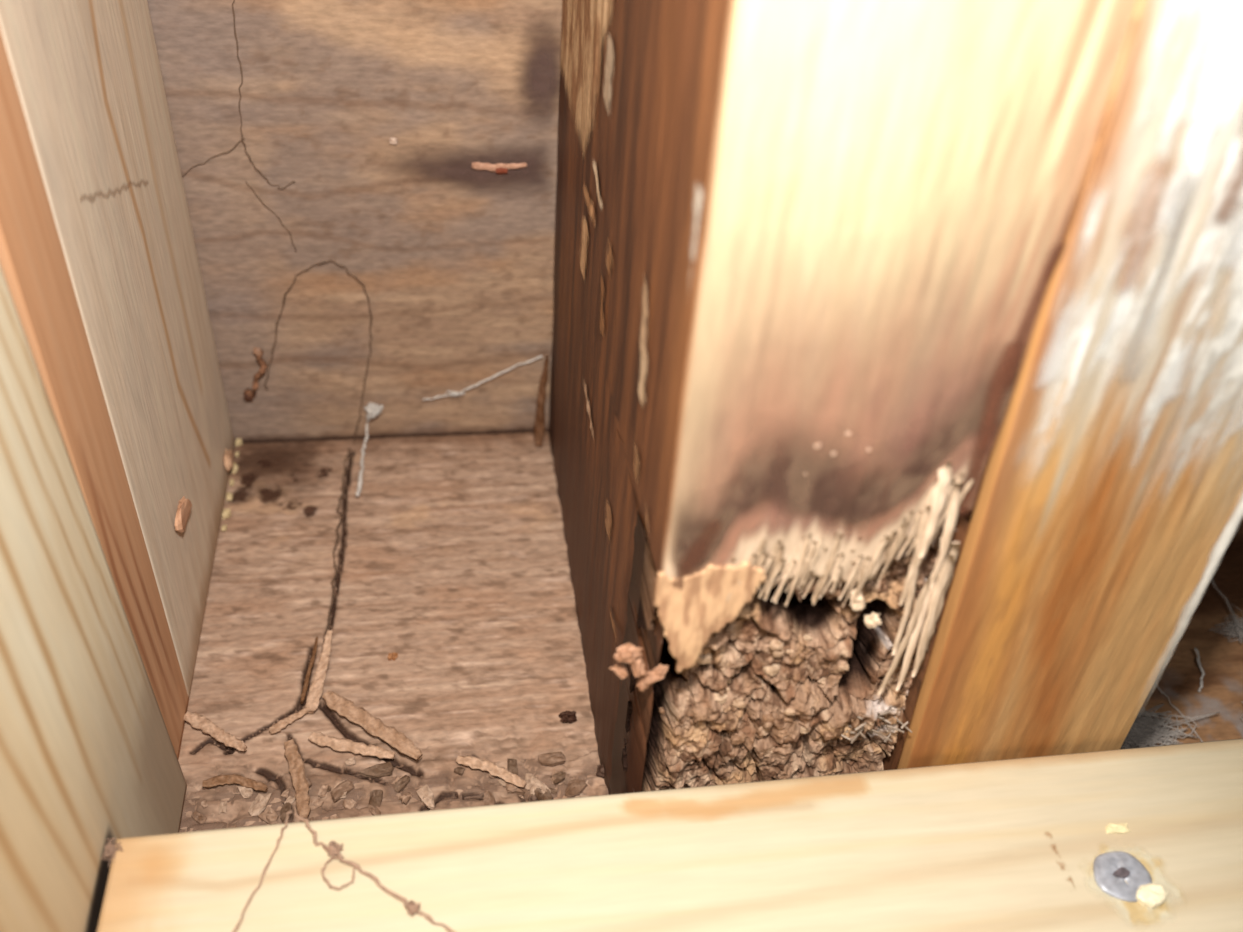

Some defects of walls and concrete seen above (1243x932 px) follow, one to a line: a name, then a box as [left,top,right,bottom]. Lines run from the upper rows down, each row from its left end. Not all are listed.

damp [525,37,560,111]
peeling [561,0,614,151]
damp [415,153,542,187]
peeling [580,162,602,279]
peeling [693,186,702,260]
peeling [600,243,612,336]
peeling [638,277,648,405]
peeling [584,385,593,435]
damp [674,246,1065,578]
crack [191,452,539,821]